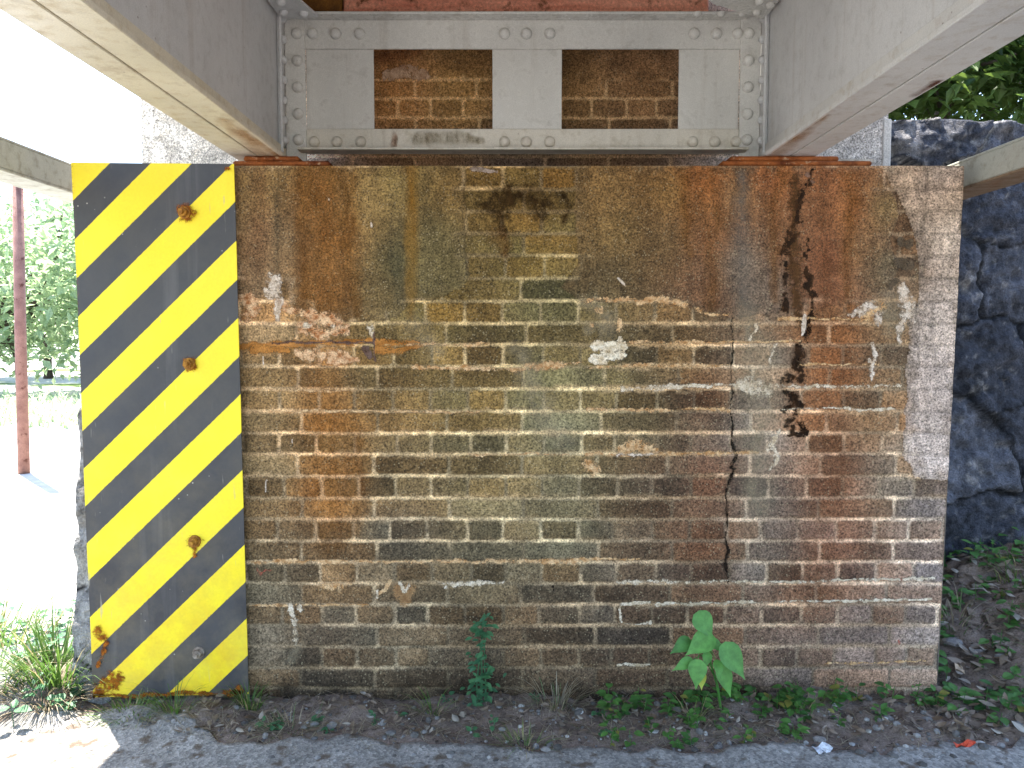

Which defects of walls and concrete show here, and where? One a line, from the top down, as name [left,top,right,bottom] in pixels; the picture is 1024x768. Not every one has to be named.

corrosion [239,332,423,362]
water stain [479,184,571,254]
crack [723,312,738,583]
flaking render [560,166,964,480]
crack [780,168,818,438]